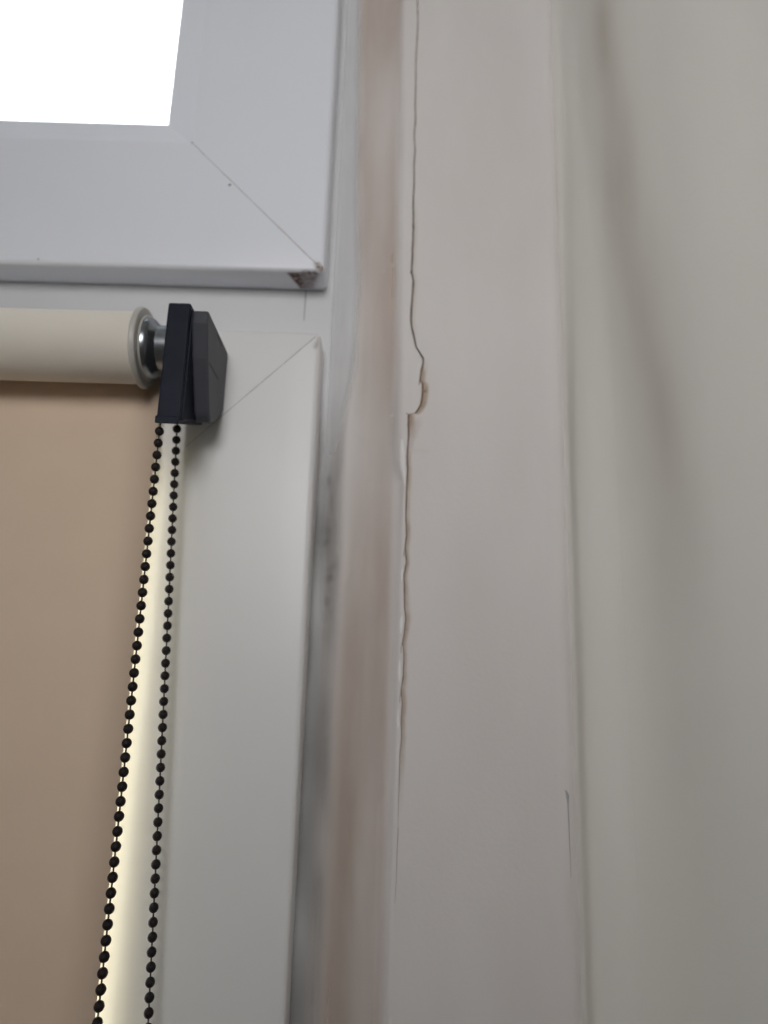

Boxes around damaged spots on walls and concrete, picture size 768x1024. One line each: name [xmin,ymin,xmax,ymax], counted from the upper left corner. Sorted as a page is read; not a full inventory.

crack [398,0,424,810]